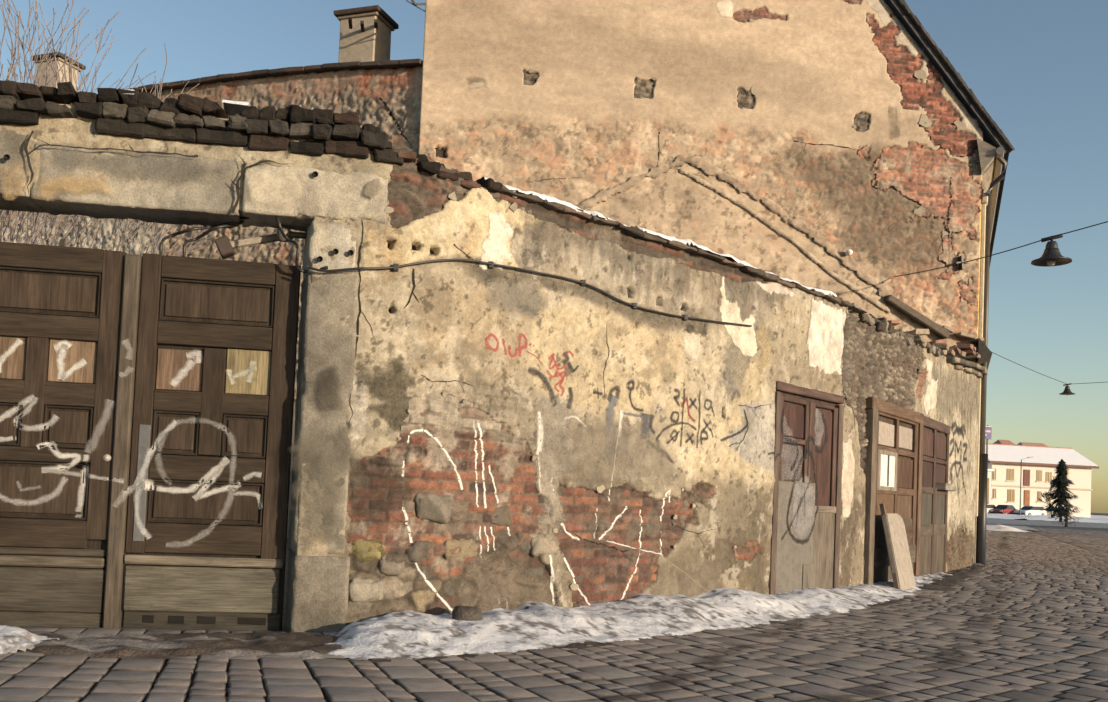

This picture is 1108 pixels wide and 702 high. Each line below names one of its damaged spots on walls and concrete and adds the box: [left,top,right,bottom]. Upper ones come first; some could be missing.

flaking render [716,0,787,23]
crack [379,97,412,147]
crack [24,131,198,195]
crack [230,157,290,214]
flaking render [844,0,984,313]
flaking render [552,481,717,608]